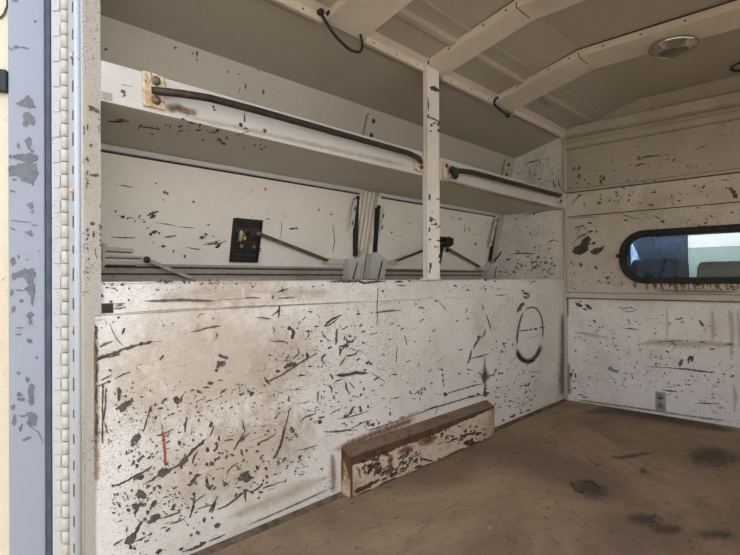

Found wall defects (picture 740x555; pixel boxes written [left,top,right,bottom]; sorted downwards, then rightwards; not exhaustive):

peeling [15,95,36,127]
peeling [8,137,39,185]
peeling [569,217,606,290]
peeling [10,255,36,343]
peeling [11,372,43,443]
peeling [94,316,120,404]
peeling [110,354,318,552]
peeling [303,377,391,436]
rust [341,419,411,448]
peeling [354,448,443,494]
peeling [427,424,486,446]
peeling [608,343,734,409]